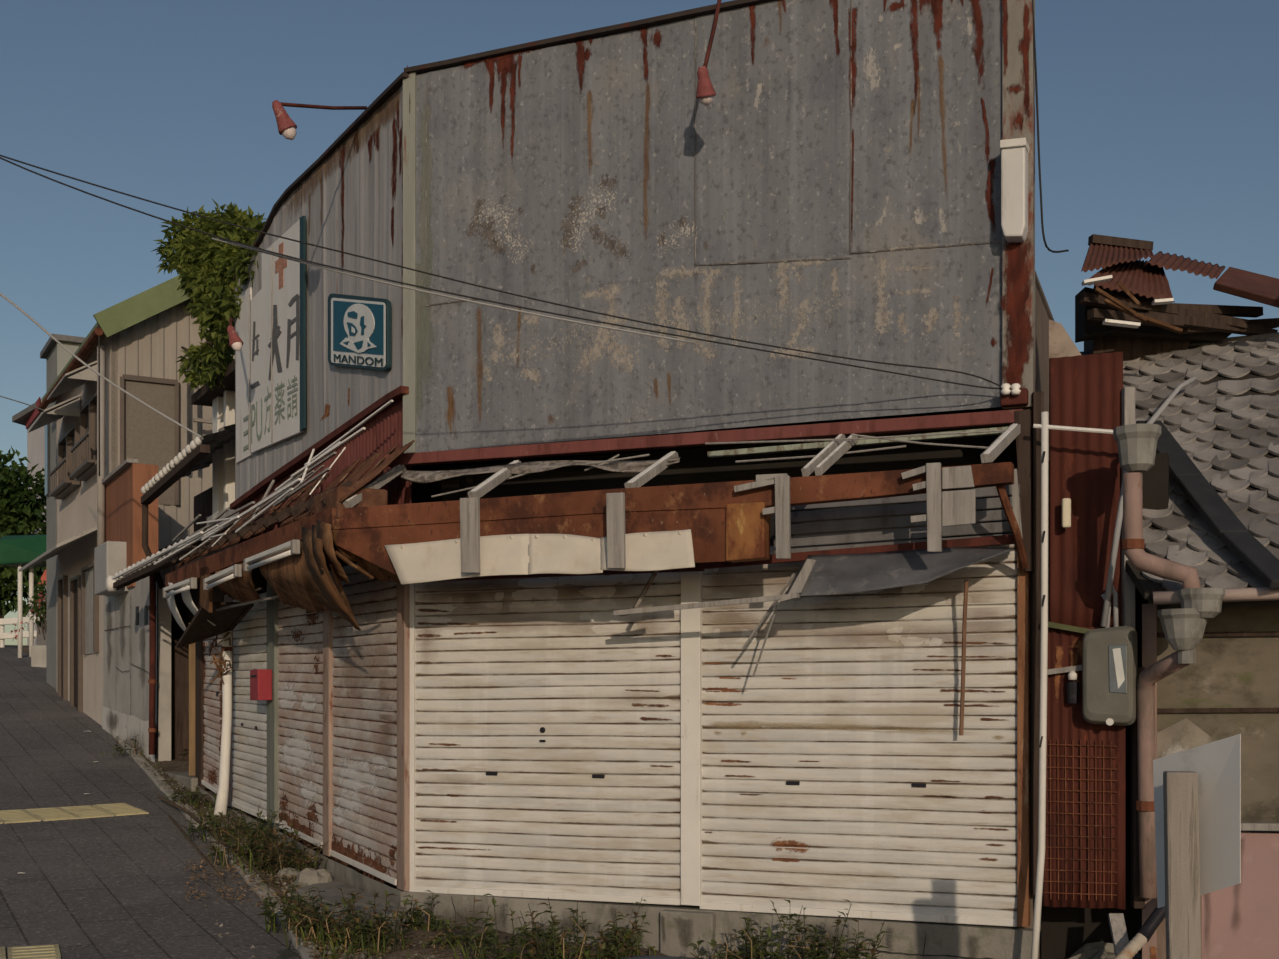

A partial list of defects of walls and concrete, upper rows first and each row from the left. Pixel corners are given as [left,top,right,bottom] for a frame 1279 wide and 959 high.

corrosion [464,46,549,157]
corrosion [575,38,593,95]
corrosion [830,0,857,106]
corrosion [1002,0,1030,130]
corrosion [339,83,410,336]
peeling [471,194,537,274]
peeling [562,167,631,273]
corrosion [986,240,1034,388]
corrosion [203,642,222,785]
peeling [278,680,316,711]
corrosion [279,794,318,845]
corrosion [772,840,808,862]